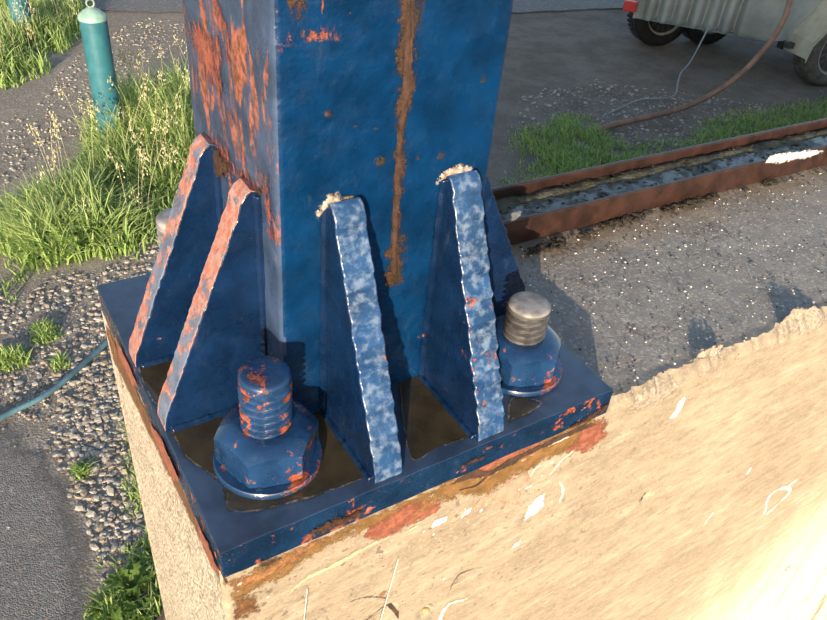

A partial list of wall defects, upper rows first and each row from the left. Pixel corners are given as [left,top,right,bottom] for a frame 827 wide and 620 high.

rust [287,0,308,20]
rust [383,0,425,287]
spalling [777,305,827,338]
spalling [690,344,724,362]
rust [106,328,609,601]